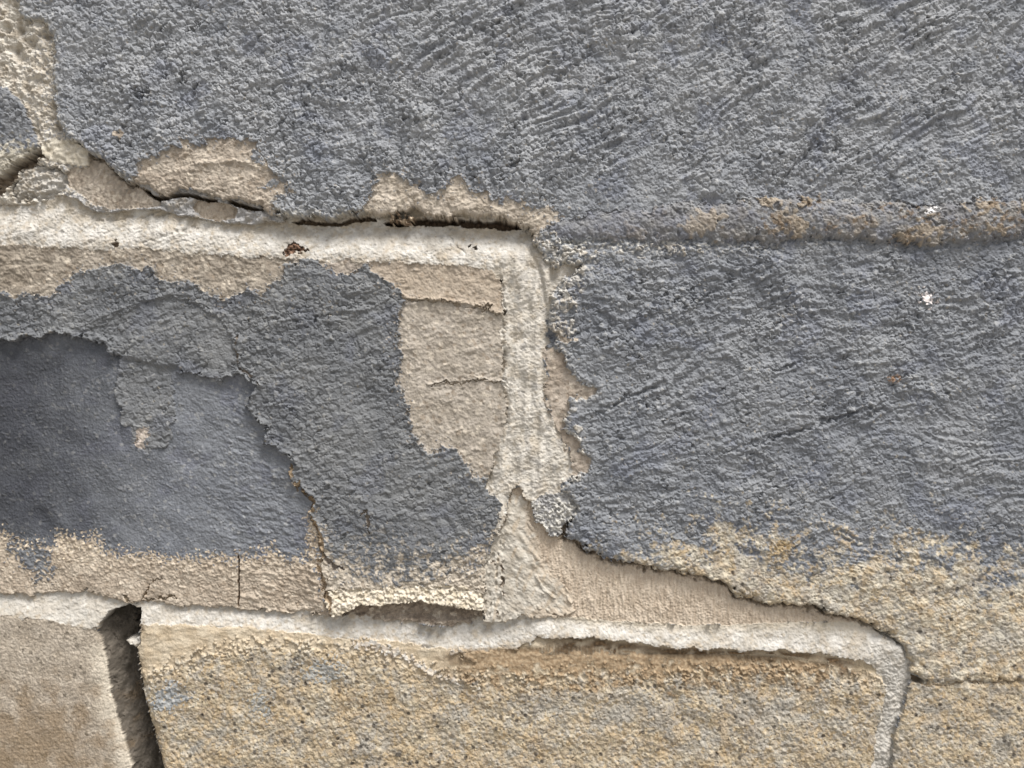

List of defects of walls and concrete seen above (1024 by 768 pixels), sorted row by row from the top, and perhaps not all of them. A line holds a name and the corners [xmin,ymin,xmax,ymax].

spalling [0,0,294,226]
crack [144,190,256,211]
crack [293,211,520,231]
peeling [361,170,561,241]
peeling [0,241,309,302]
peeling [319,258,508,479]
peeling [134,427,154,449]
crack [288,464,349,617]
crack [360,510,370,533]
spalling [0,487,874,627]
crack [99,578,178,768]
crack [910,674,1020,688]